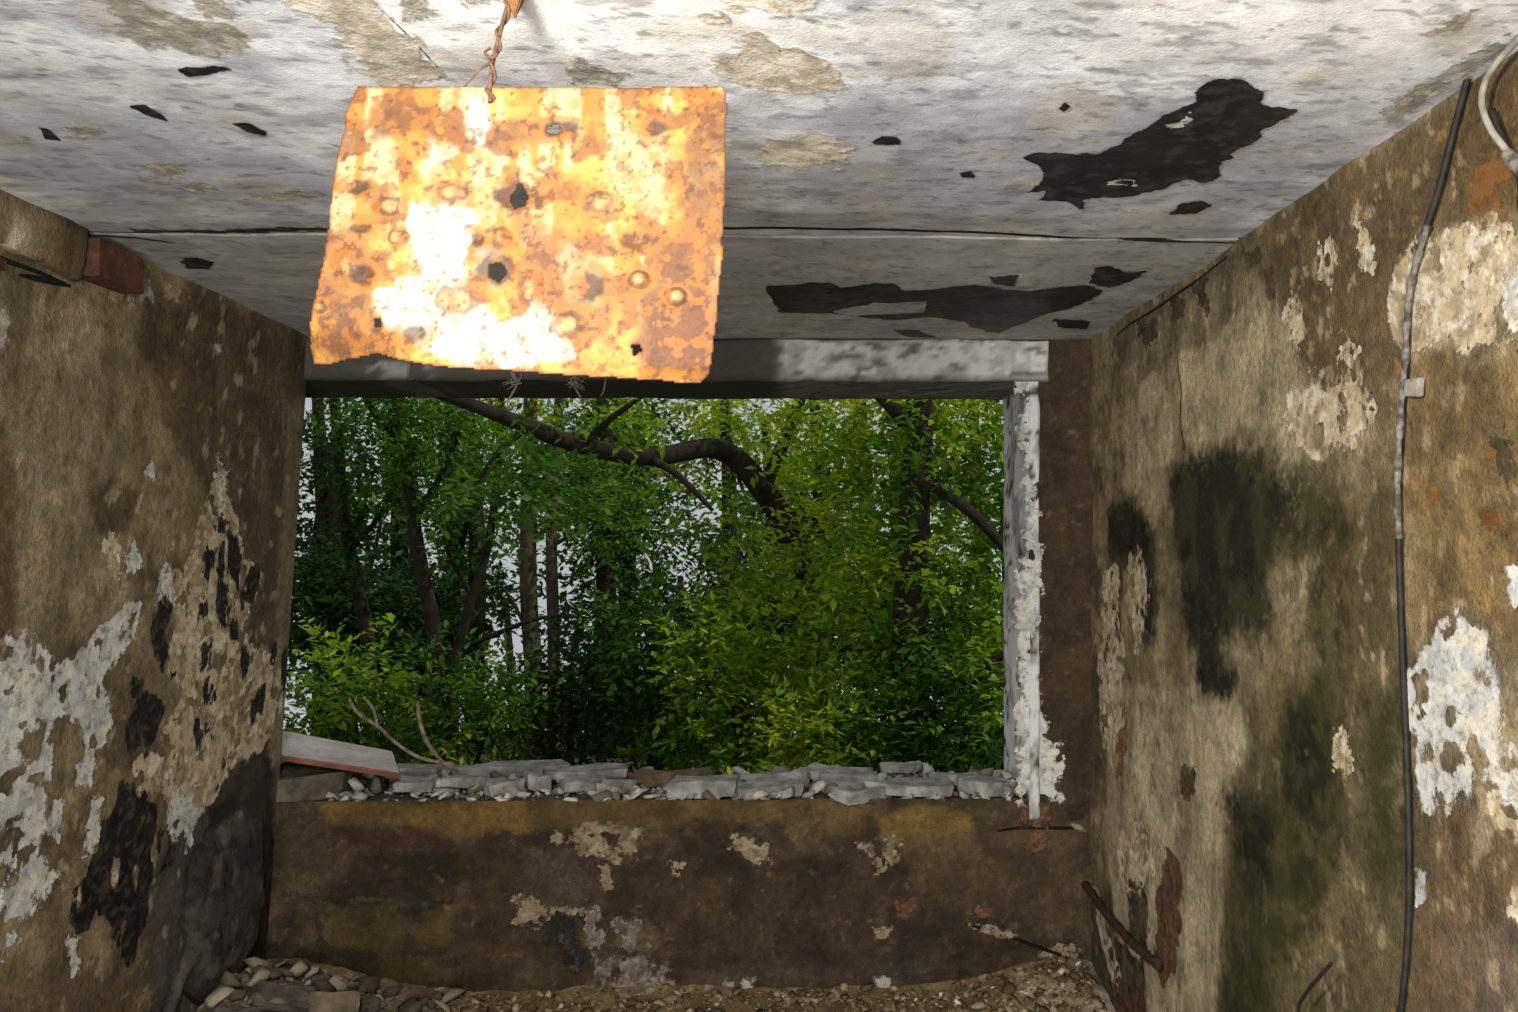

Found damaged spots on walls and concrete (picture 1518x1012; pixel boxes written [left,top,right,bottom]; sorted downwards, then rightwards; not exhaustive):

peeling [1023,78,1298,209]
crack [0,255,71,288]
peeling [766,266,1147,338]
peeling [1241,246,1378,464]
peeling [1353,210,1518,358]
peeling [1005,381,1066,855]
leakage [1107,491,1157,644]
leakage [1169,441,1349,701]
peeling [0,453,284,963]
leakage [1179,764,1196,801]
leakage [1285,704,1329,813]
peeling [1407,608,1518,844]